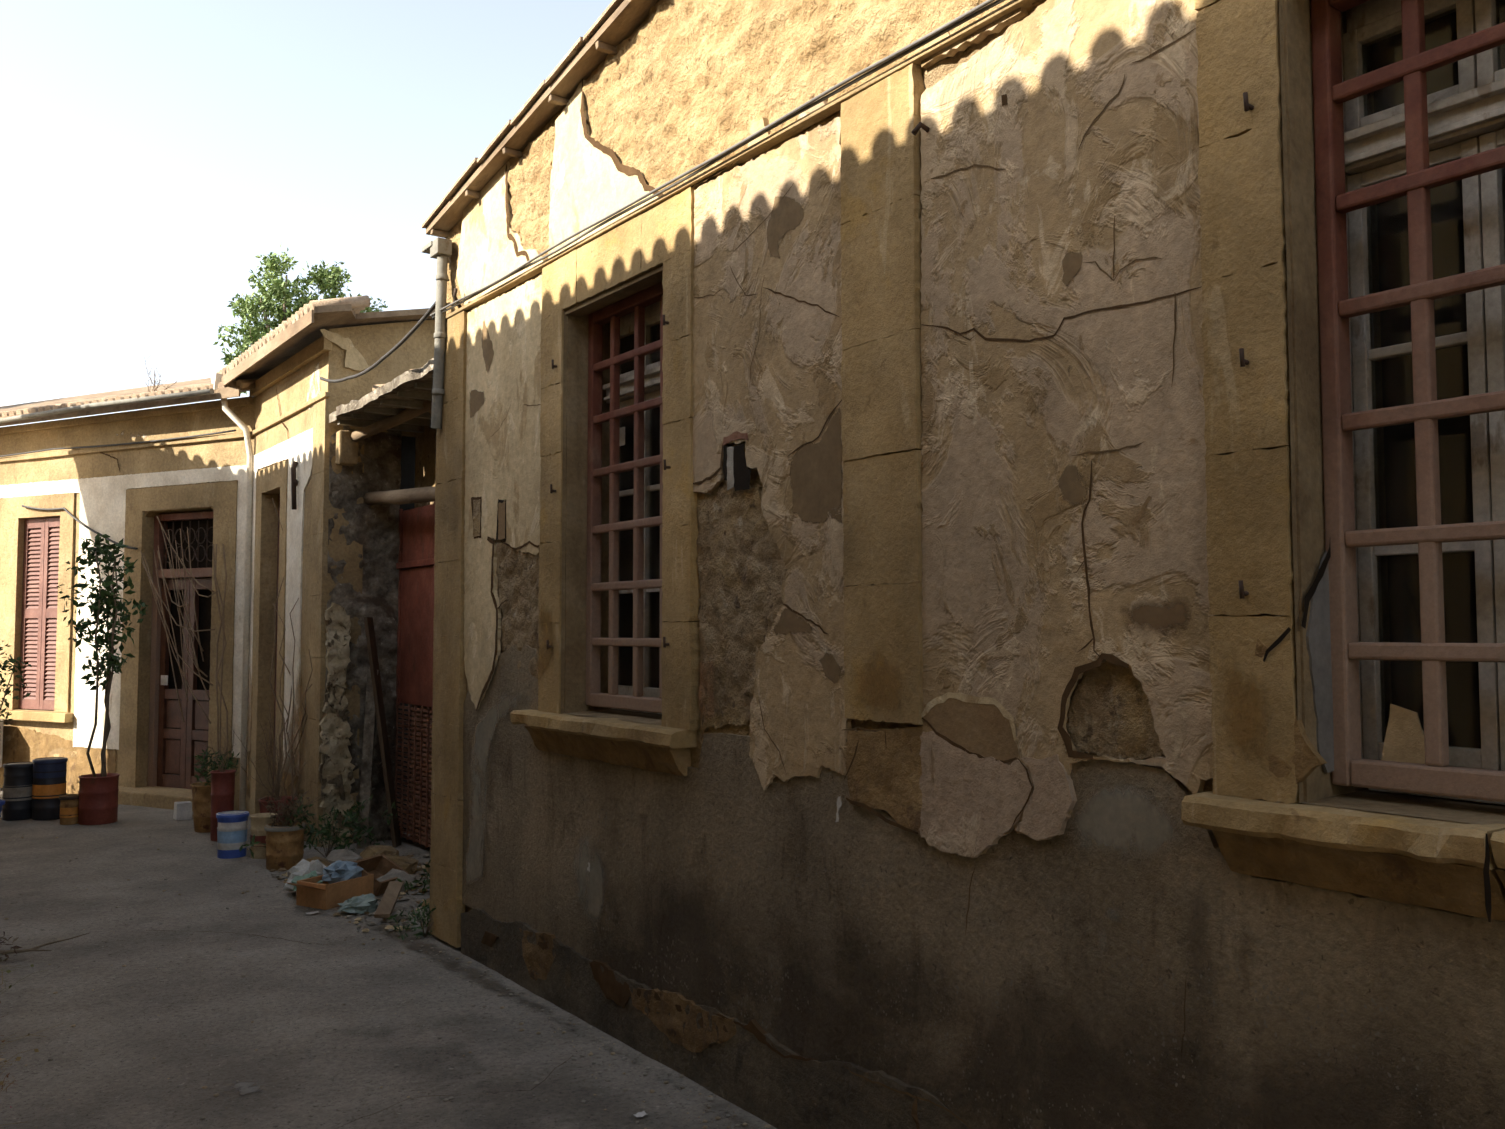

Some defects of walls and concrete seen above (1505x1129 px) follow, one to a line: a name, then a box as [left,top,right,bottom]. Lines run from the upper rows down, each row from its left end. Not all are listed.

crack [694,184,839,388]
peeling [767,197,804,258]
crack [921,216,1202,388]
spalling [496,541,539,679]
peeling [790,408,842,523]
peeling [819,652,841,683]
crack [1070,442,1143,659]
peeling [845,653,1165,858]
crack [1483,833,1492,922]
water stain [590,806,1461,1129]